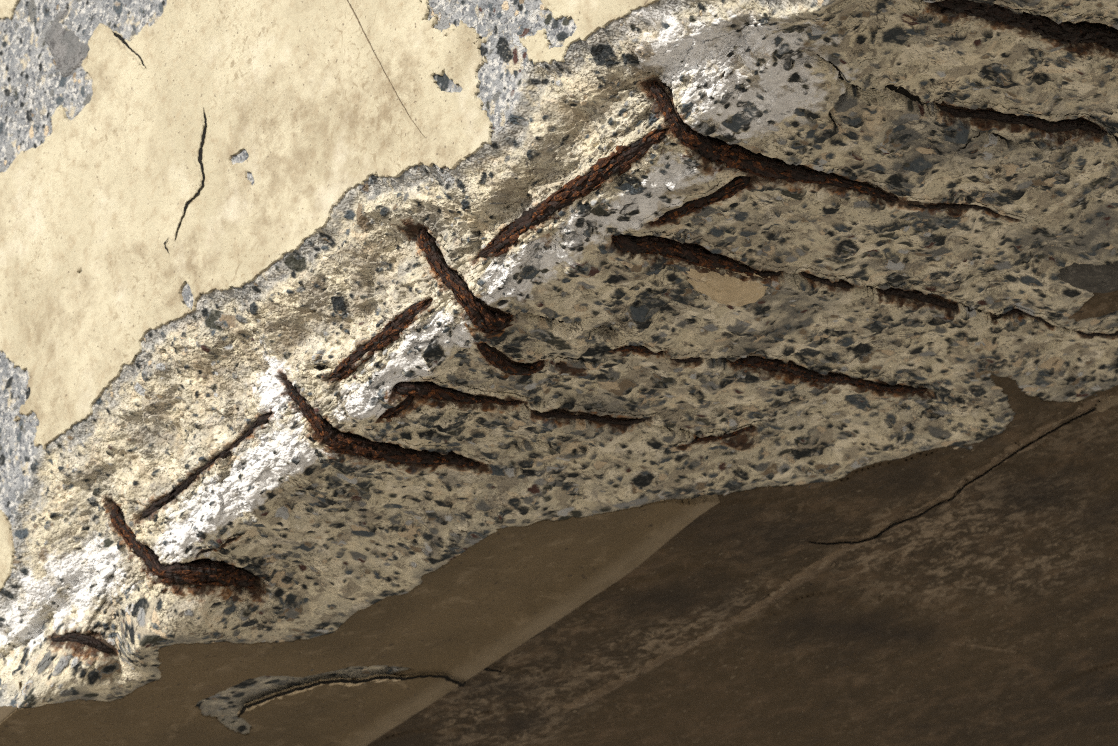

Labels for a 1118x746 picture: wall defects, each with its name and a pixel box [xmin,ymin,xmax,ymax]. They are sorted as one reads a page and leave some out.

rust [913,0,1118,72]
crack [164,108,206,252]
spalling [0,0,666,589]
rust [95,72,1027,620]
damp [468,142,712,314]
spalling [650,176,750,226]
spalling [649,80,899,202]
rust [927,96,1115,156]
damp [141,298,473,558]
crack [808,408,1097,545]
damp [0,510,162,700]
crack [237,668,502,717]